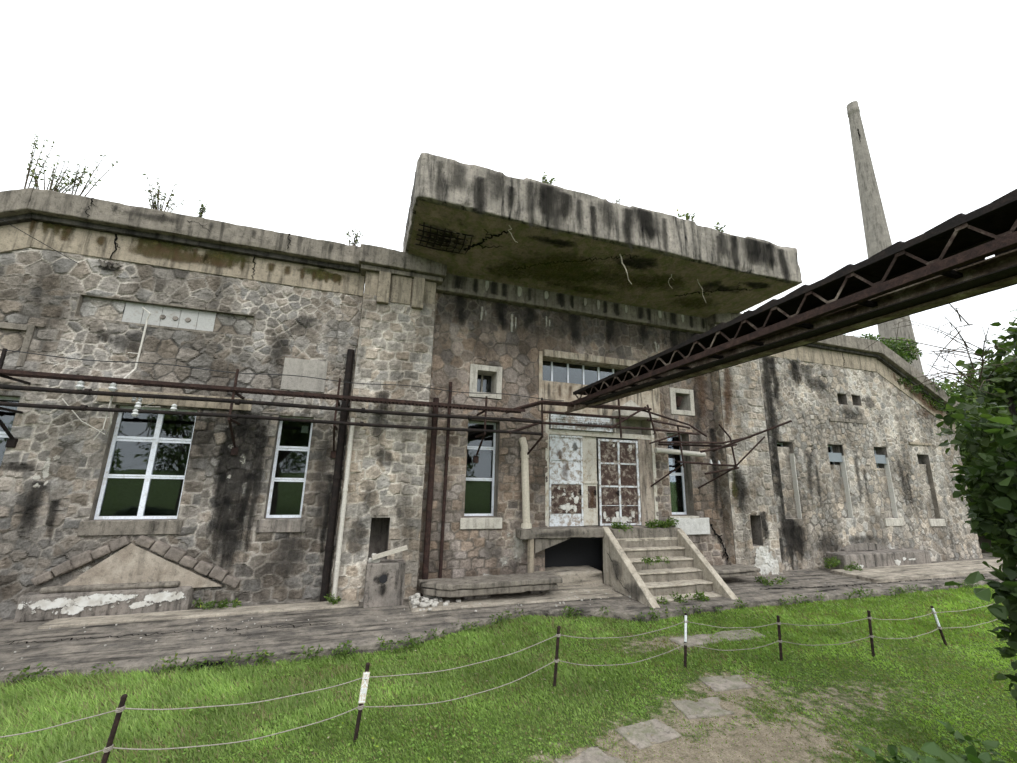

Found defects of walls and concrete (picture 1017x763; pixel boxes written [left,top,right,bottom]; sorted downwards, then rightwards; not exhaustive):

damp [454,163,464,187]
damp [476,173,514,214]
damp [528,181,667,269]
crack [109,234,120,259]
damp [702,281,769,292]
damp [210,411,267,565]
peeling [551,486,579,513]
peeling [603,511,635,523]
peeling [17,591,186,615]